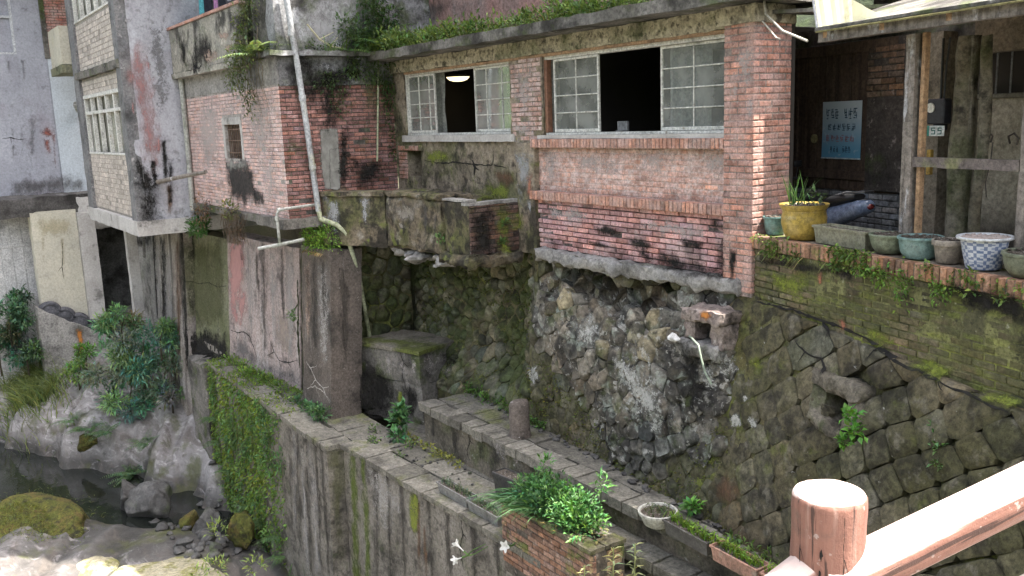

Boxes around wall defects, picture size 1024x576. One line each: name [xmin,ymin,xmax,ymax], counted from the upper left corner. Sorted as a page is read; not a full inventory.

leakage [179,25,217,73]
leakage [135,141,174,318]
crack [425,151,506,189]
leakage [181,232,254,366]
crack [231,280,329,401]